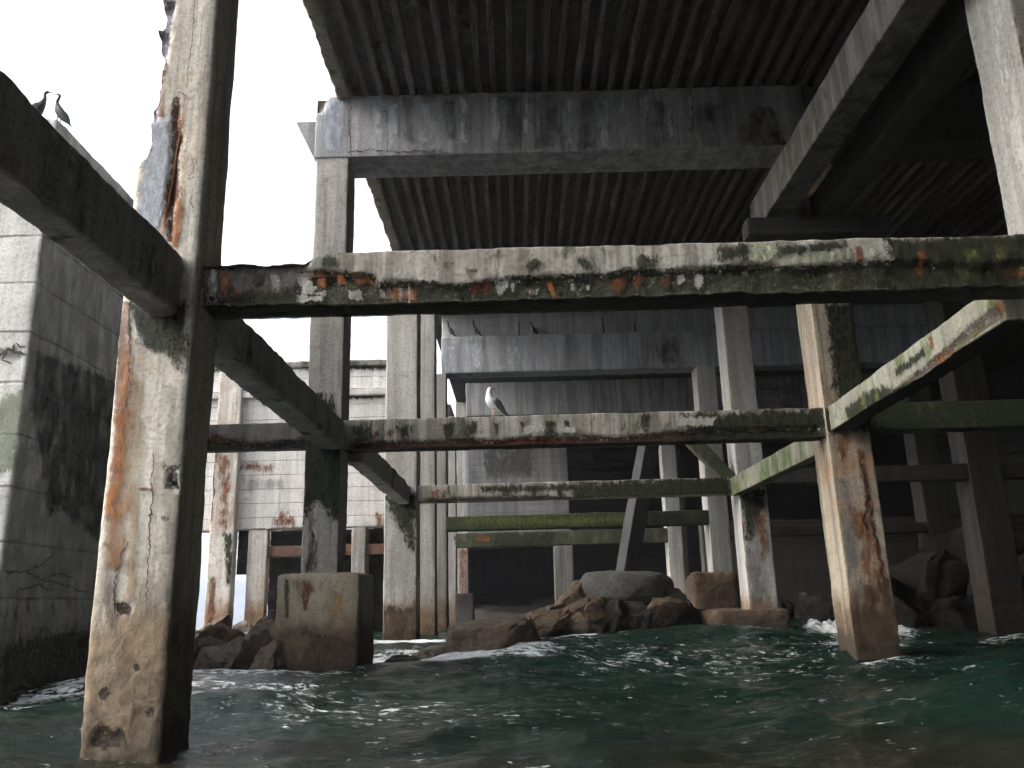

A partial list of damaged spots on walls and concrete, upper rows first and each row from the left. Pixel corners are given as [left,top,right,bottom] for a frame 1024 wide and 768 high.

spalling [159,0,176,62]
peeling [136,76,183,242]
crack [348,101,450,156]
corrosion [314,270,373,289]
leakage [677,274,704,289]
leakage [32,351,115,541]
crack [6,451,154,616]
corrosion [104,352,153,569]
corrosion [207,577,215,623]
corrosion [208,434,272,528]
corrosion [835,432,890,618]
crack [858,453,890,610]